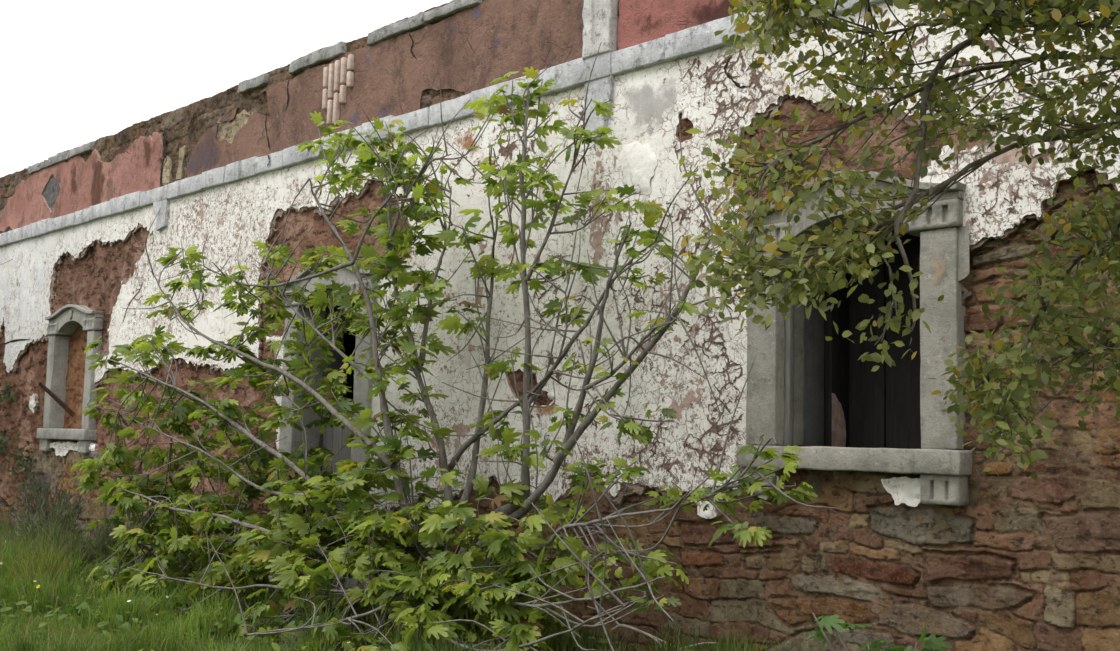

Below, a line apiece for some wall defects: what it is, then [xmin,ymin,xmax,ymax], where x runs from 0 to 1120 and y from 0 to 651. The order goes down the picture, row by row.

spalling [738,95,921,147]
spalling [1057,164,1120,199]
peeling [179,193,243,240]
spalling [254,169,379,281]
spalling [969,199,1048,254]
spalling [44,223,152,314]
crack [457,37,783,484]
spalling [0,323,49,375]
spalling [257,295,284,359]
peeling [669,378,705,420]
spalling [554,462,687,506]